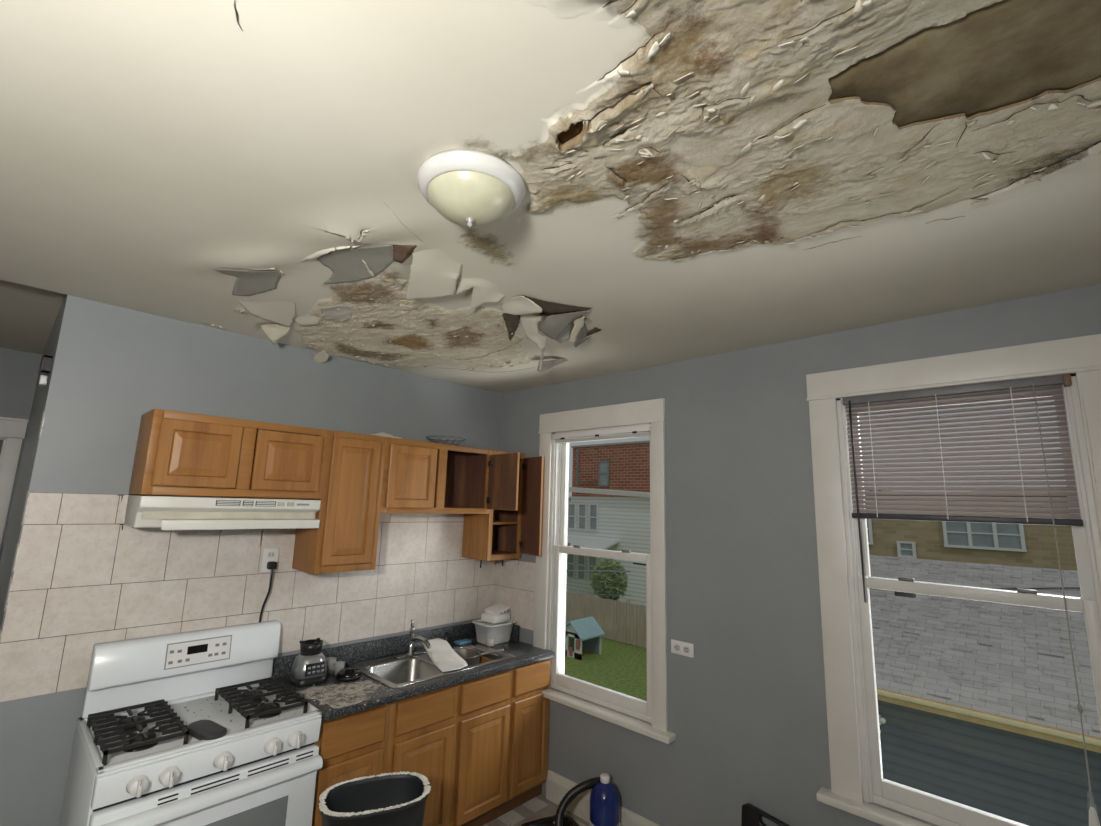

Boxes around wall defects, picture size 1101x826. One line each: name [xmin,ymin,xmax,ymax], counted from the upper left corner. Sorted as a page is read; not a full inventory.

spalling [157,0,1101,373]